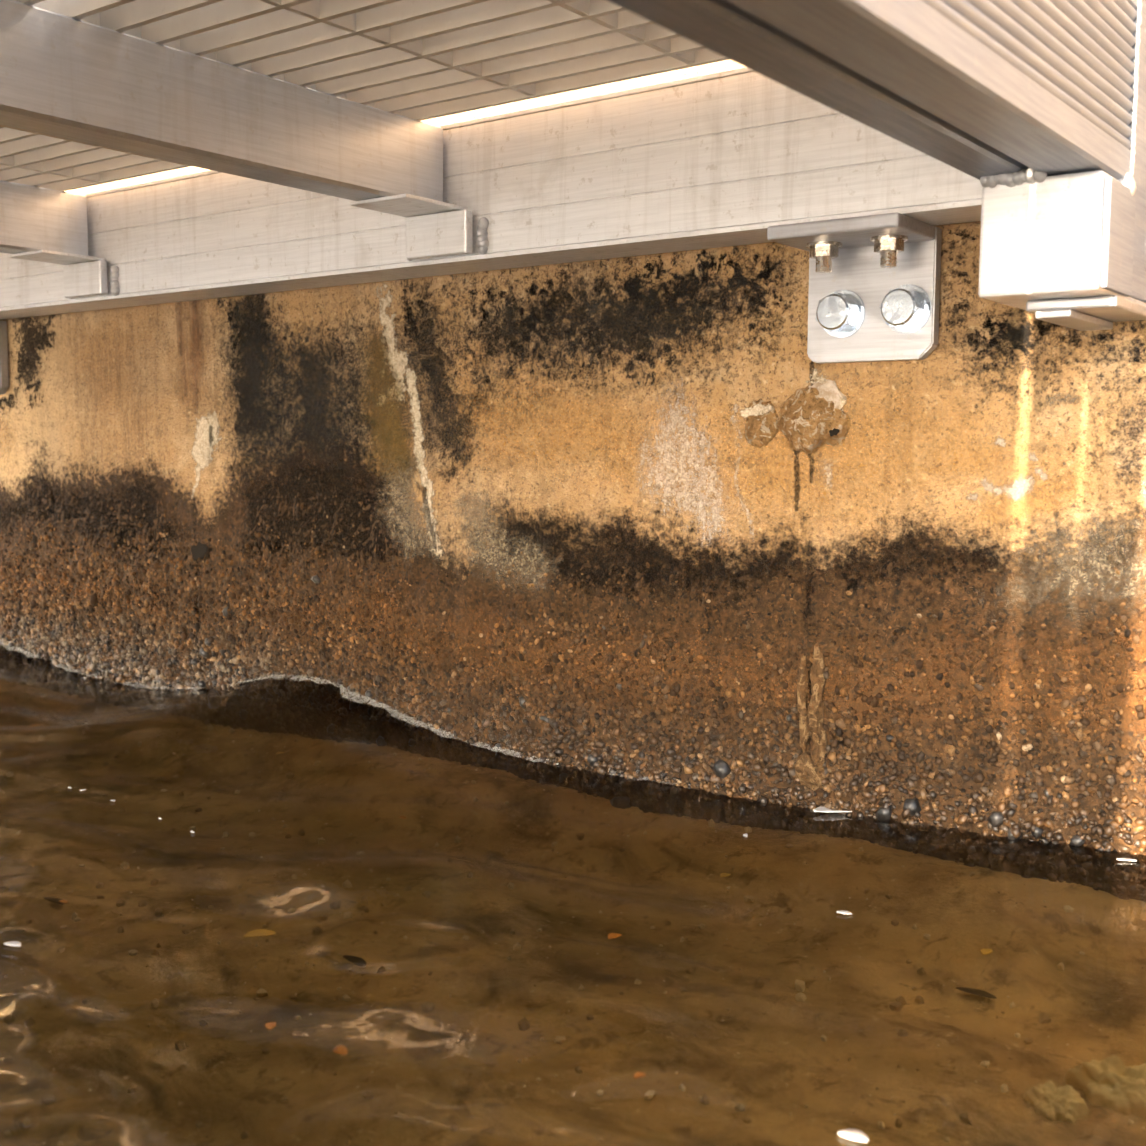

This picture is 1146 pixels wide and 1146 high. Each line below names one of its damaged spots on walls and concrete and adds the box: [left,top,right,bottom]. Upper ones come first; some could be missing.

peeling [740,404,772,417]
peeling [806,369,847,409]
peeling [191,411,221,498]
peeling [968,453,1047,501]
leakage [0,279,1146,901]
spalling [0,474,1146,903]